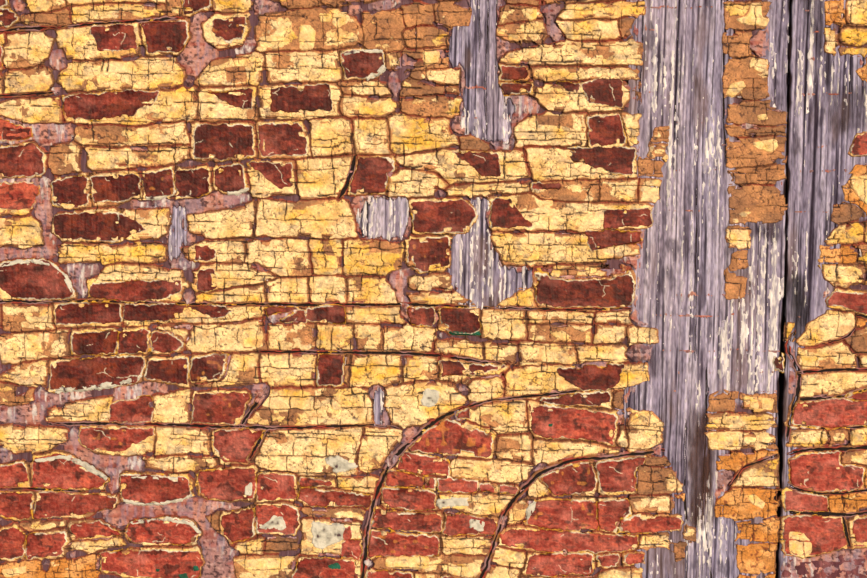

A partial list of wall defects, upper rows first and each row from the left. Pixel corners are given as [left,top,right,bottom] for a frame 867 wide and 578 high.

crack [0,90,56,98]
crack [0,16,184,34]
crack [720,23,728,169]
crack [338,156,357,199]
crack [0,298,631,312]
peeling [0,0,670,578]
crack [259,349,507,365]
crack [479,180,713,578]
peeling [448,0,867,578]
crack [729,329,867,486]
crack [46,387,594,578]
crack [786,484,867,547]